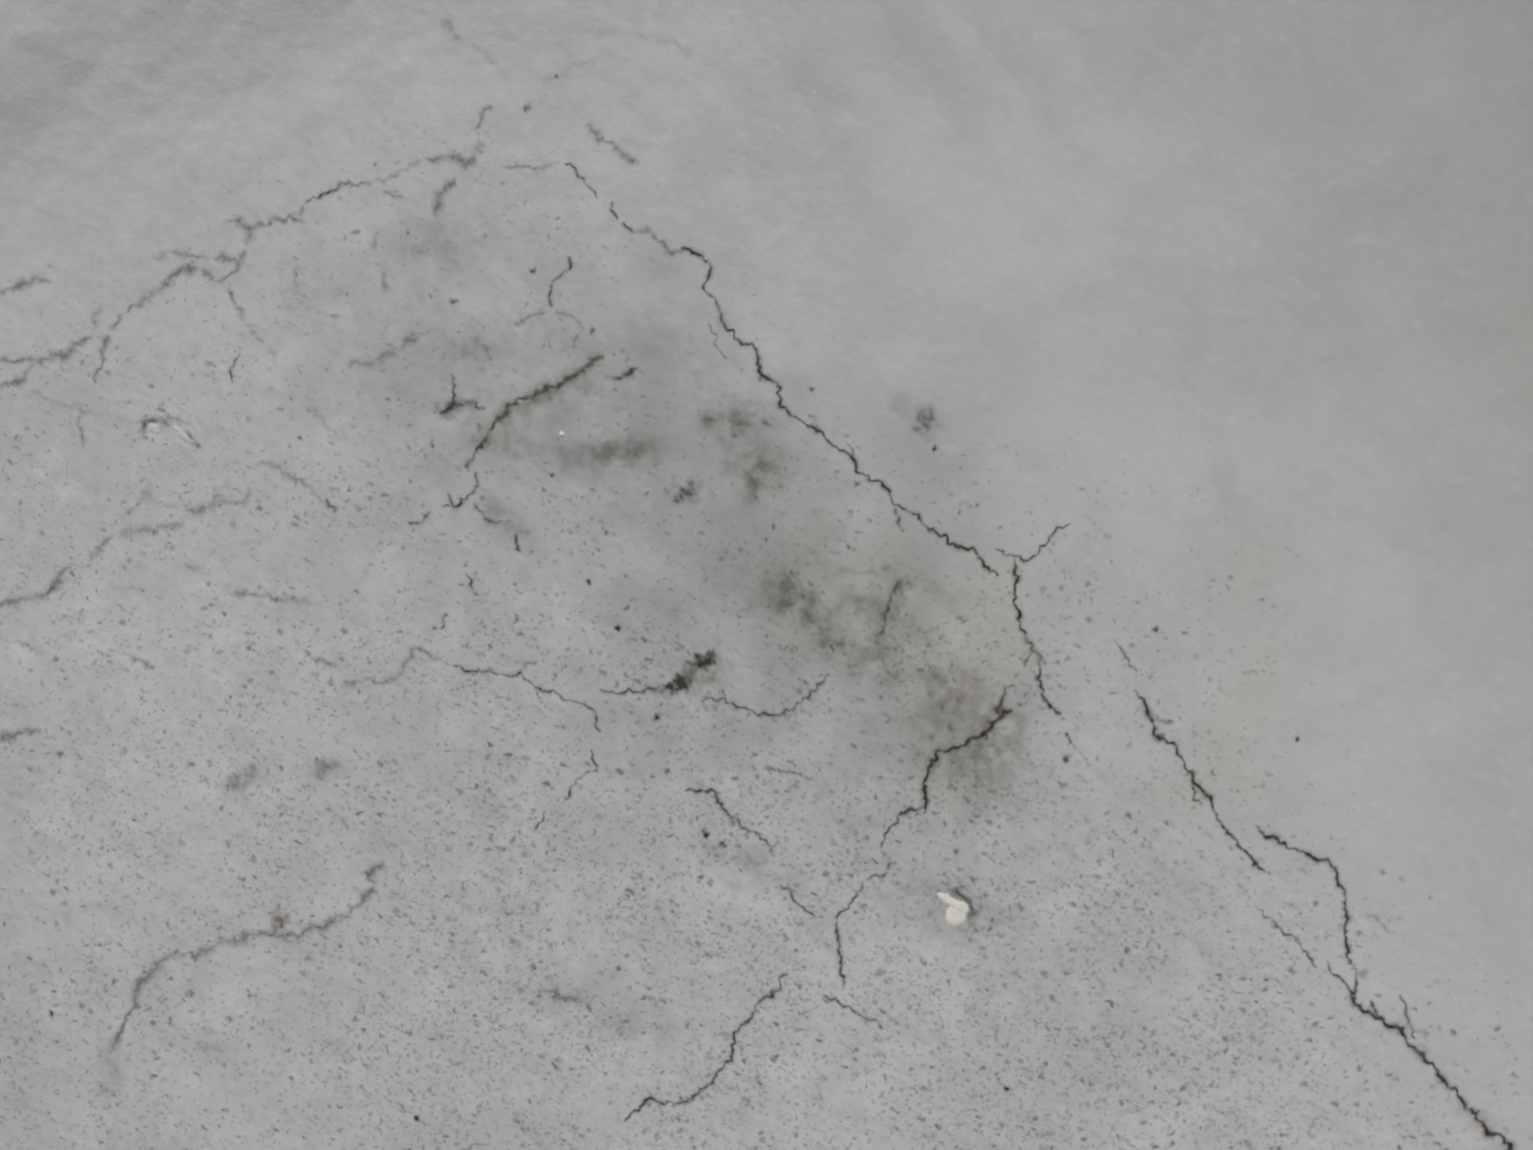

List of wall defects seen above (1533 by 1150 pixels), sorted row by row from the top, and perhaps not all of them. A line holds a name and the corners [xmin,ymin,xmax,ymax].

crack [236,182,359,229]
crack [429,156,474,209]
crack [410,356,634,551]
crack [529,137,1070,1021]
crack [454,665,679,826]
crack [287,865,381,935]
crack [1139,697,1513,1150]
crack [115,974,150,1041]
crack [625,975,782,1120]